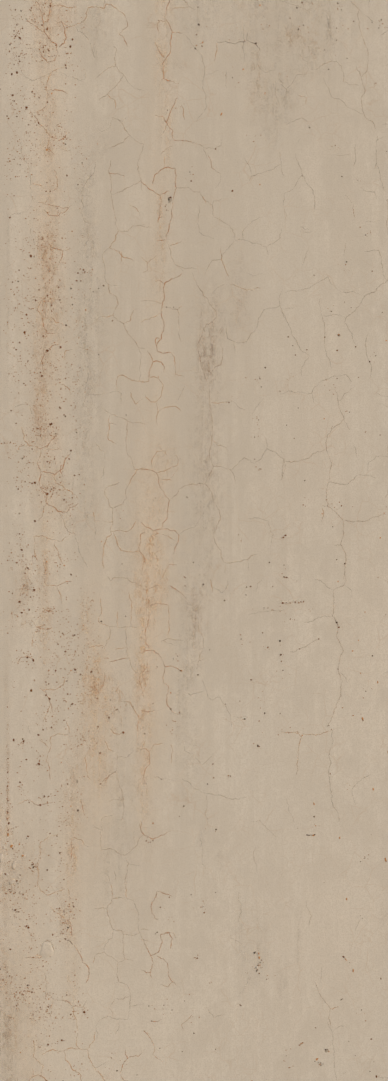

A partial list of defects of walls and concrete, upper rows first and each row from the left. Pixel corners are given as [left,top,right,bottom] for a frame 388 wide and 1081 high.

crack [28,4,128,92]